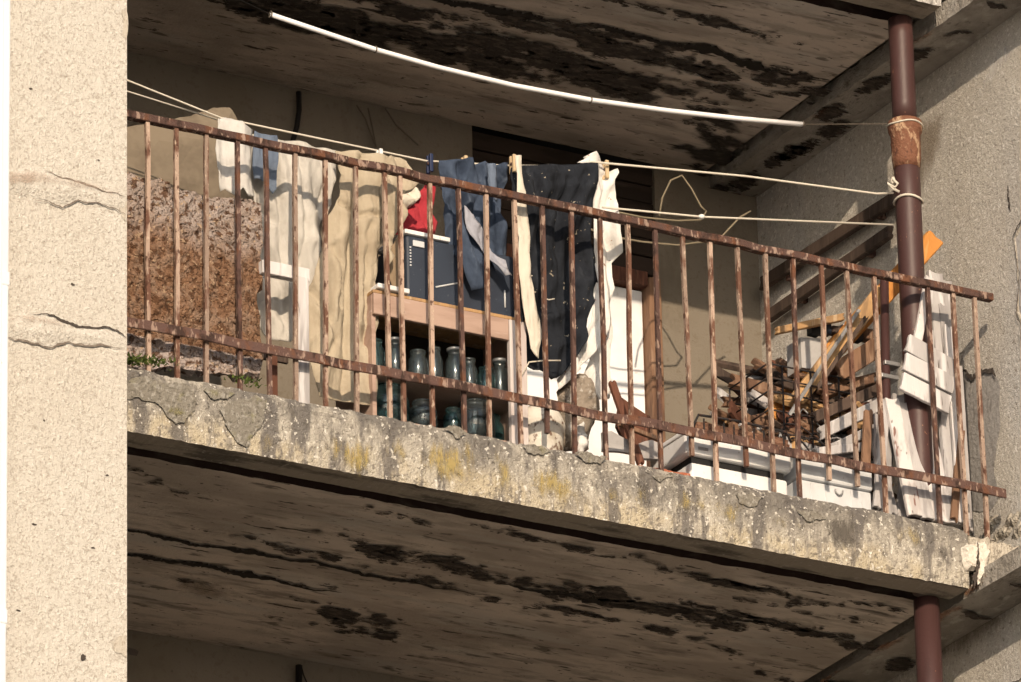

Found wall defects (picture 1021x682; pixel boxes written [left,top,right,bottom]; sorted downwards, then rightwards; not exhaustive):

crack [1007,189,1021,339]
leakage [827,519,854,544]
peeling [961,368,1021,588]